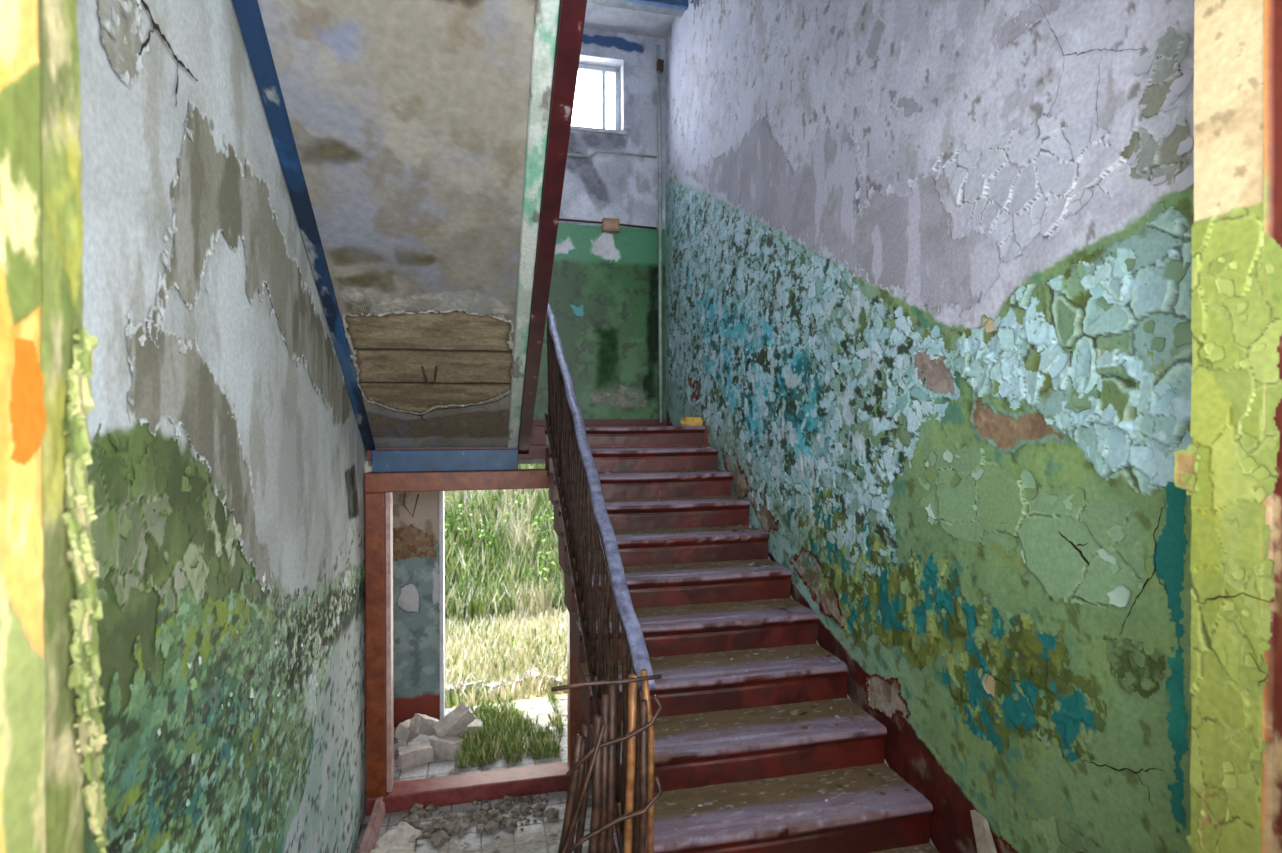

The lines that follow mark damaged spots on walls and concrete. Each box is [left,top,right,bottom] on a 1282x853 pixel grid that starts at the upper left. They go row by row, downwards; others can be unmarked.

damp [306,141,360,161]
peeling [10,338,46,465]
flaking render [342,308,514,414]
peeling [668,26,1282,853]
peeling [62,322,364,853]
crack [1058,531,1089,565]
crack [1077,757,1164,806]